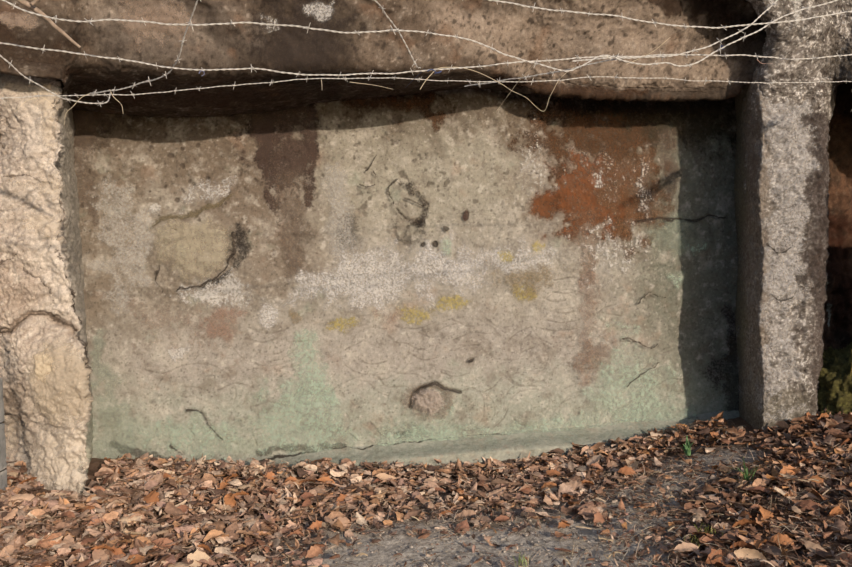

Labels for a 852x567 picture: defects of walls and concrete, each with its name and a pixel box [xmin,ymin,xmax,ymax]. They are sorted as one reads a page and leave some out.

leakage [229,103,319,211]
corrosion [491,73,678,260]
crack [636,214,726,222]
spalling [409,381,462,414]